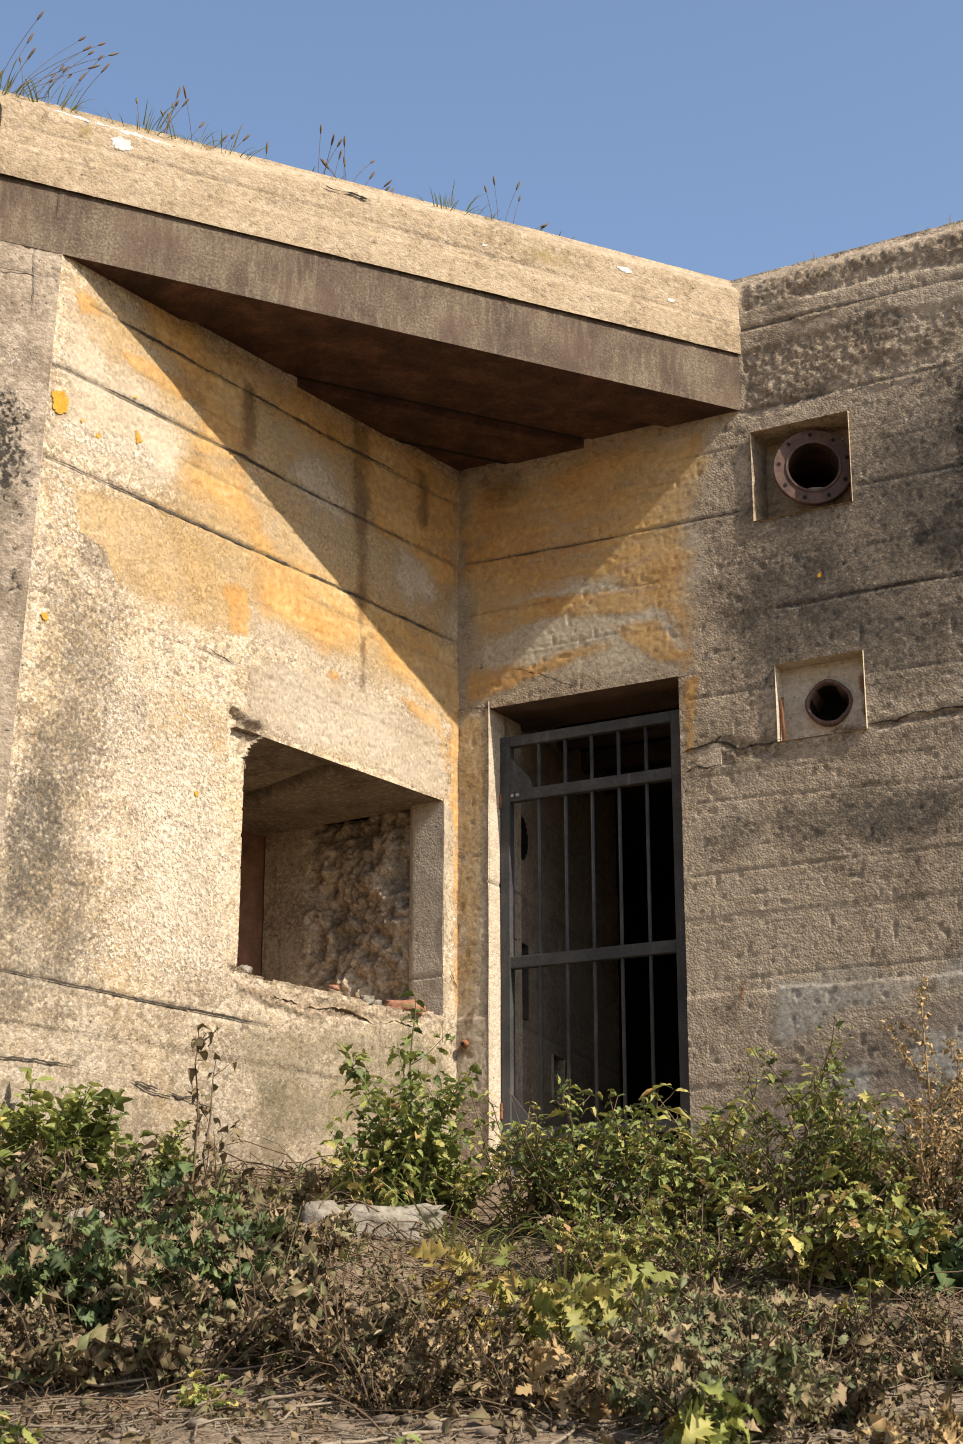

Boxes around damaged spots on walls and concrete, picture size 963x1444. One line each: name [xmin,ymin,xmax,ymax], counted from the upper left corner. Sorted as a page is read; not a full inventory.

damp [0,392,33,516]
damp [724,360,963,693]
damp [0,599,235,1006]
damp [48,281,702,1013]
crack [680,736,781,773]
corrosion [834,675,866,732]
crack [867,705,963,724]